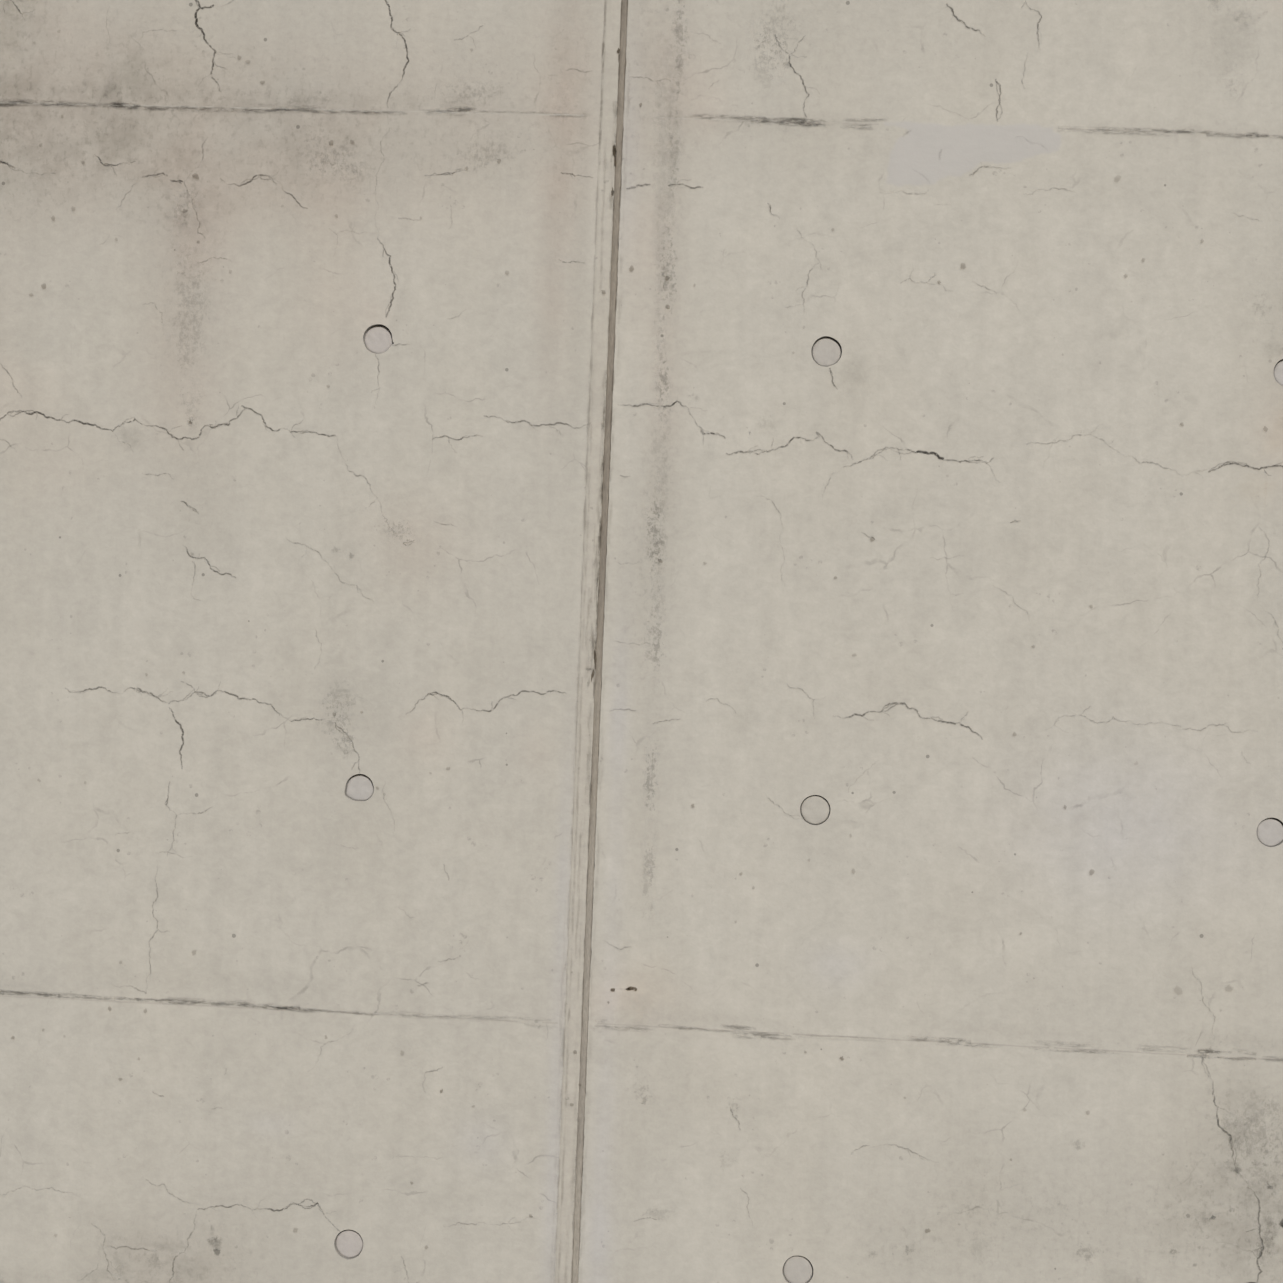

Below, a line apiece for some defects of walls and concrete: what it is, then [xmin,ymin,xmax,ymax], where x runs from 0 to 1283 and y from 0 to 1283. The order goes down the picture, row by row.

crack [195,2,216,66]